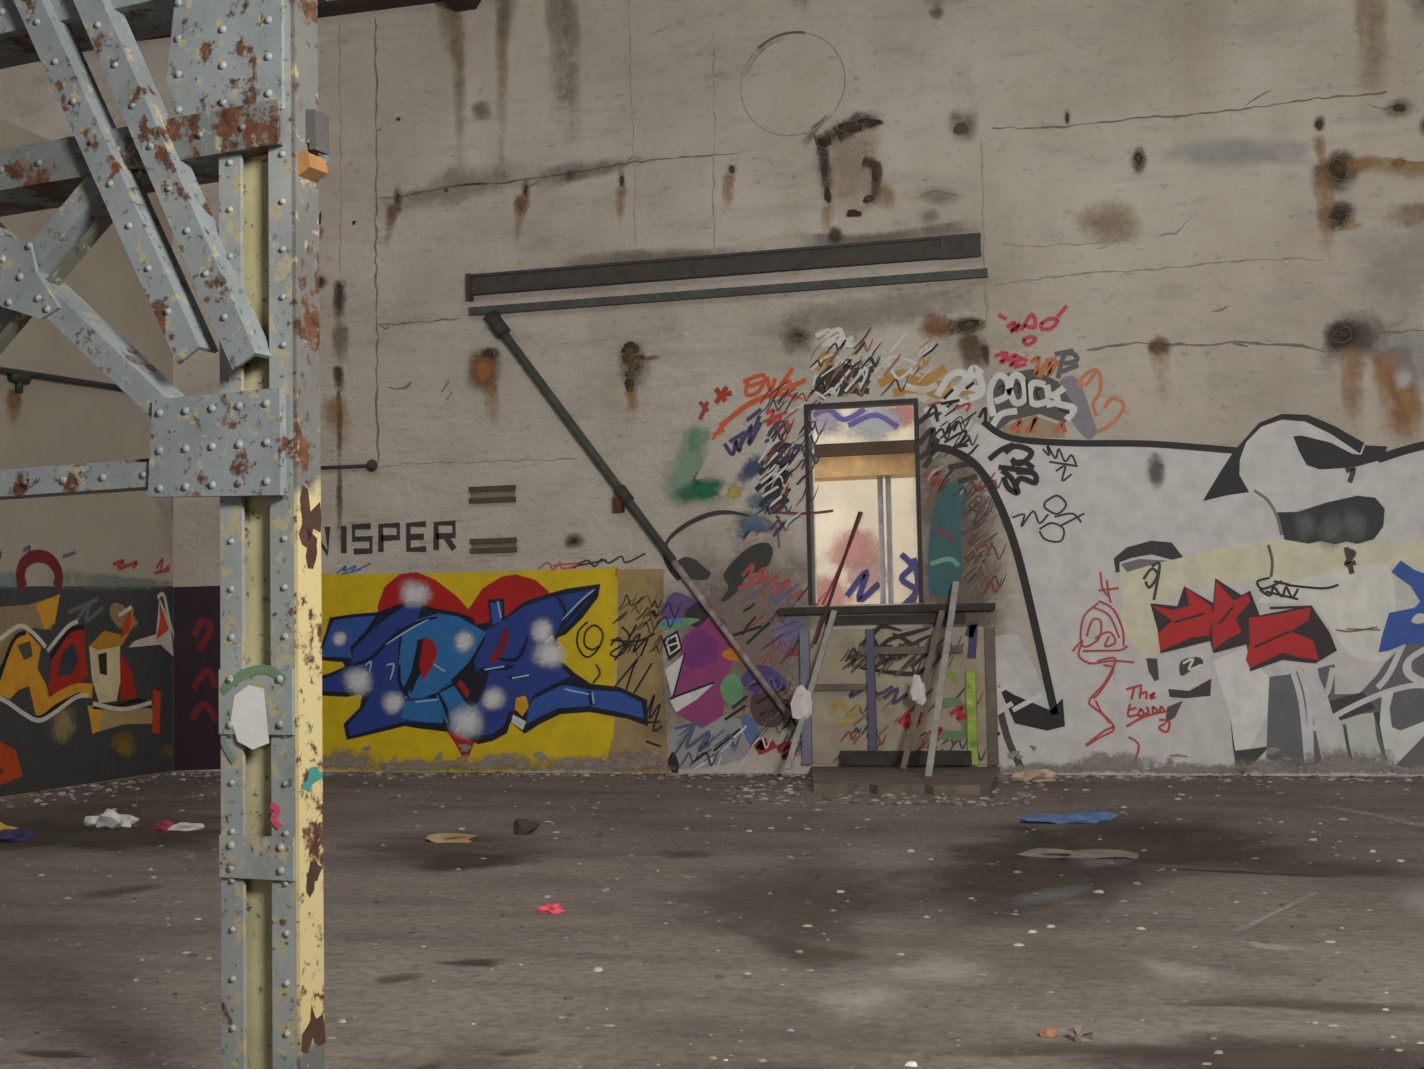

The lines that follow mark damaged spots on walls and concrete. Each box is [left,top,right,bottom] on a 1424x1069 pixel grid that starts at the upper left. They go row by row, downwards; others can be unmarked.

rust [1350,158,1424,174]
crack [916,90,1396,333]
rust [8,390,20,414]
rust [328,367,343,448]
rust [1376,349,1417,424]
rust [299,472,342,569]
rust [306,859,322,897]
rust [301,1006,326,1053]